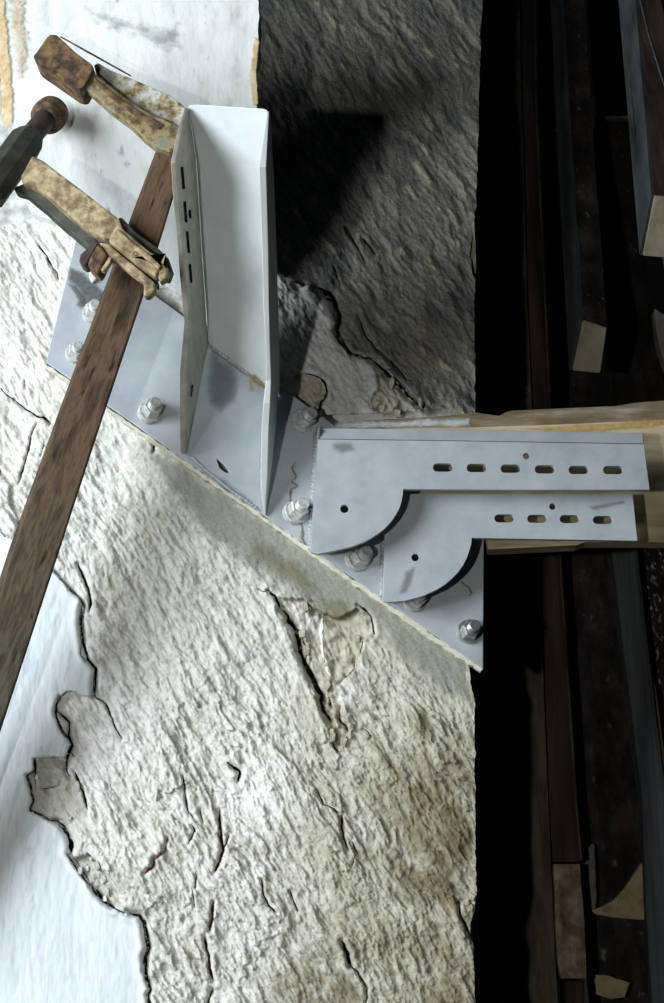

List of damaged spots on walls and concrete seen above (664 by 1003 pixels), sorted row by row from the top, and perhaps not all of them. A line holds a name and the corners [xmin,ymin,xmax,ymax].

spalling [296,373,328,409]
spalling [371,373,417,418]
crack [0,379,50,482]
water stain [155,457,465,694]
spalling [281,599,373,748]
spalling [29,757,84,822]
peeling [122,827,166,869]
crack [318,792,358,867]
spalling [72,855,122,907]
crack [261,879,298,912]
spalling [456,891,475,918]
crack [341,941,368,1003]